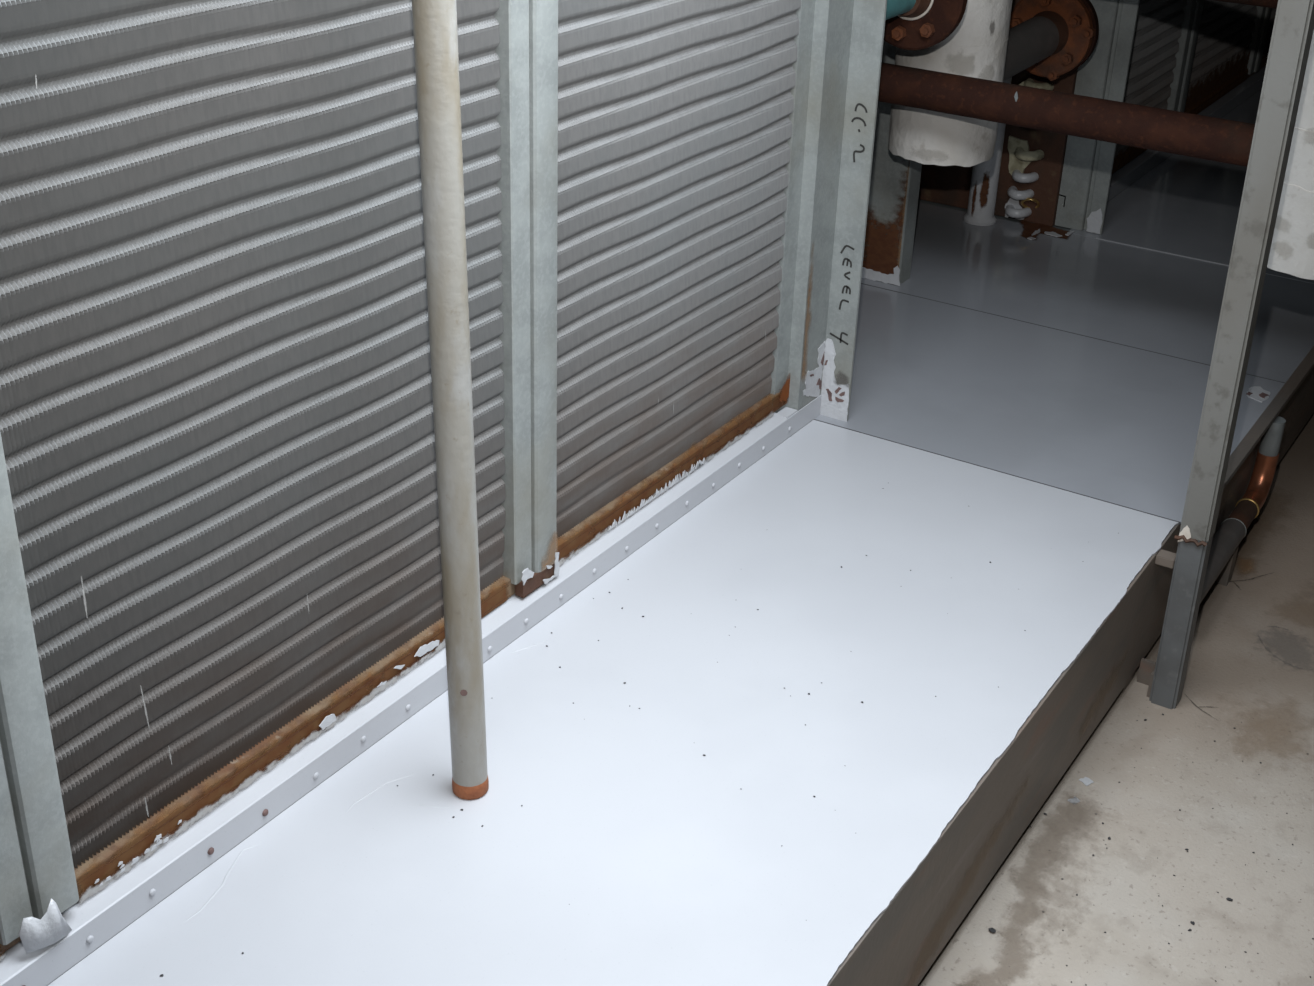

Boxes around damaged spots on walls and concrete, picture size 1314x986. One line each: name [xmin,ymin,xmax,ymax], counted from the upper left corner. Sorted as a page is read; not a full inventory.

rust [1184,48,1251,114]
rust [1112,146,1147,174]
rust [862,162,910,285]
rust [541,287,811,571]
rust [480,581,510,618]
rust [77,623,445,899]